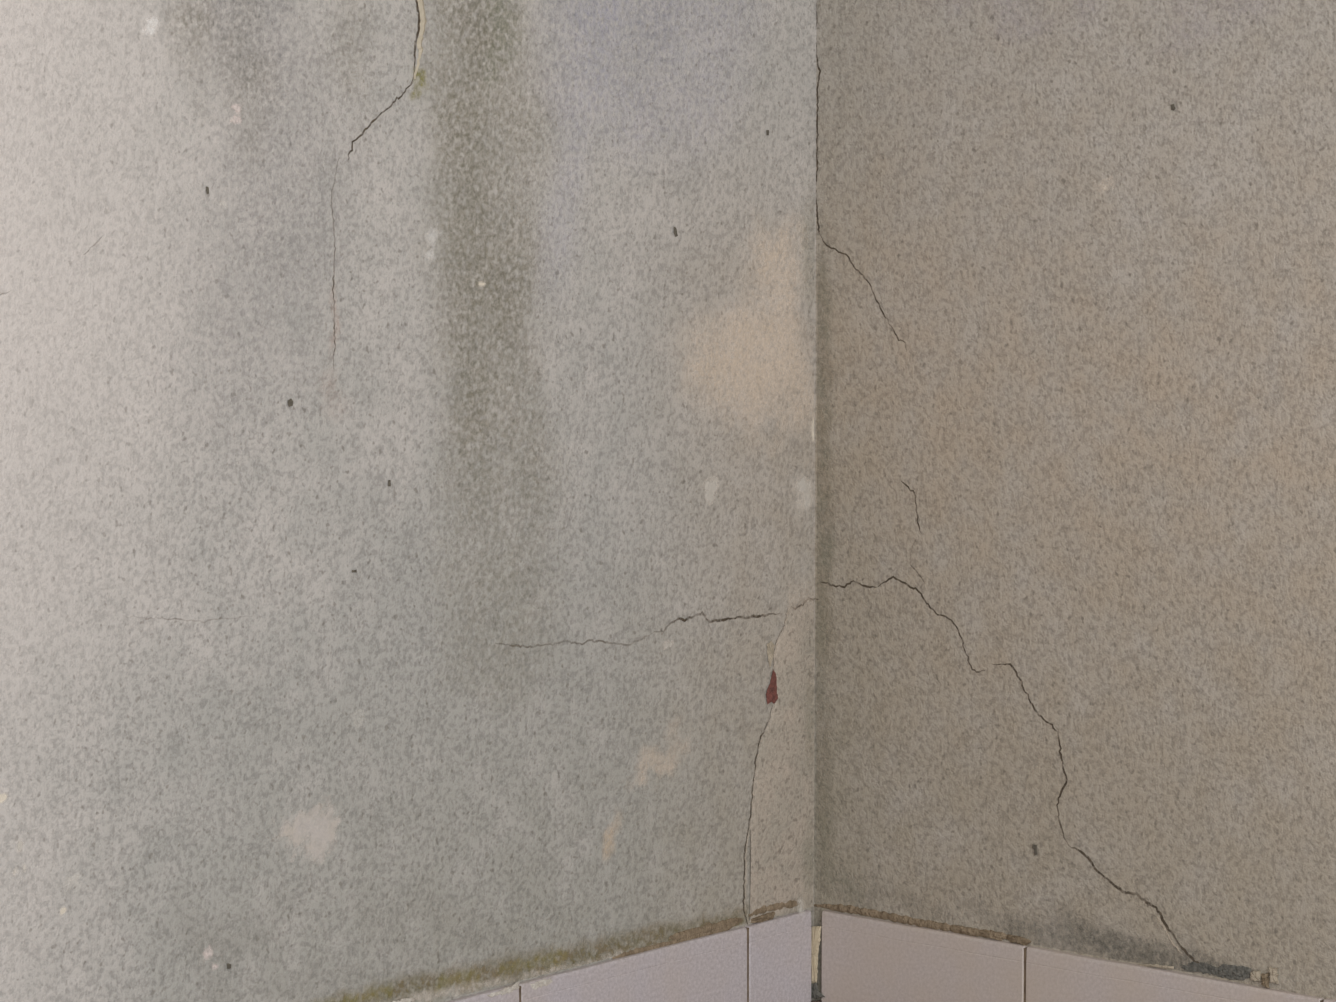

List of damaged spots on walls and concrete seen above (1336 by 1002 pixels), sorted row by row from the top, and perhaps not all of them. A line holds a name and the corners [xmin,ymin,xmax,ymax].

crack [348,0,427,160]
crack [816,3,905,343]
crack [901,481,922,534]
crack [674,568,1200,964]